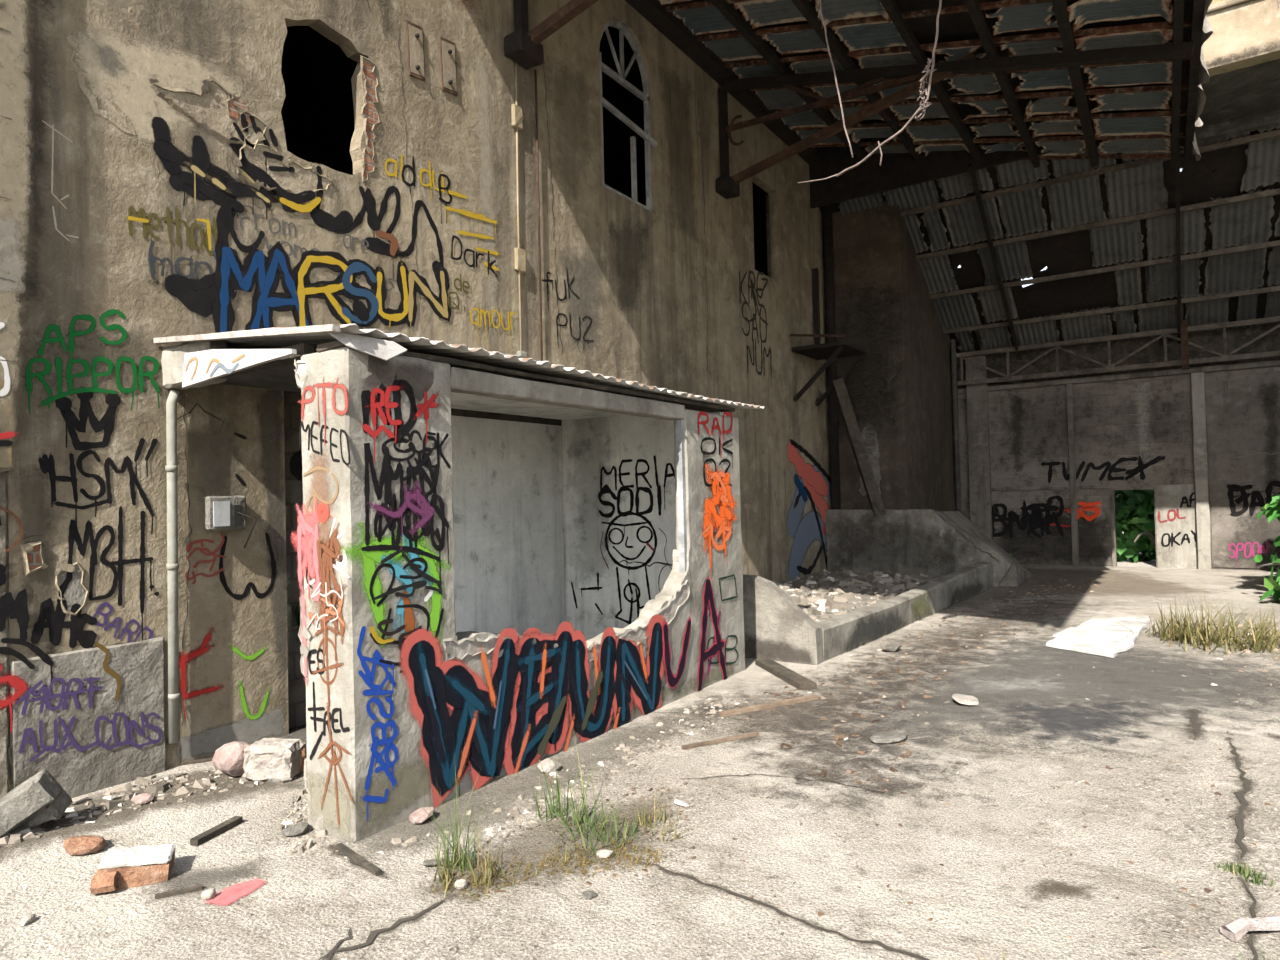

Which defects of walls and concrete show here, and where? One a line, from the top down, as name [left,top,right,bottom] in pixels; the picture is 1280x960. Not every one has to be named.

damp [27,0,47,228]
peeling [66,29,340,195]
flaking render [360,55,380,182]
crack [319,893,457,960]